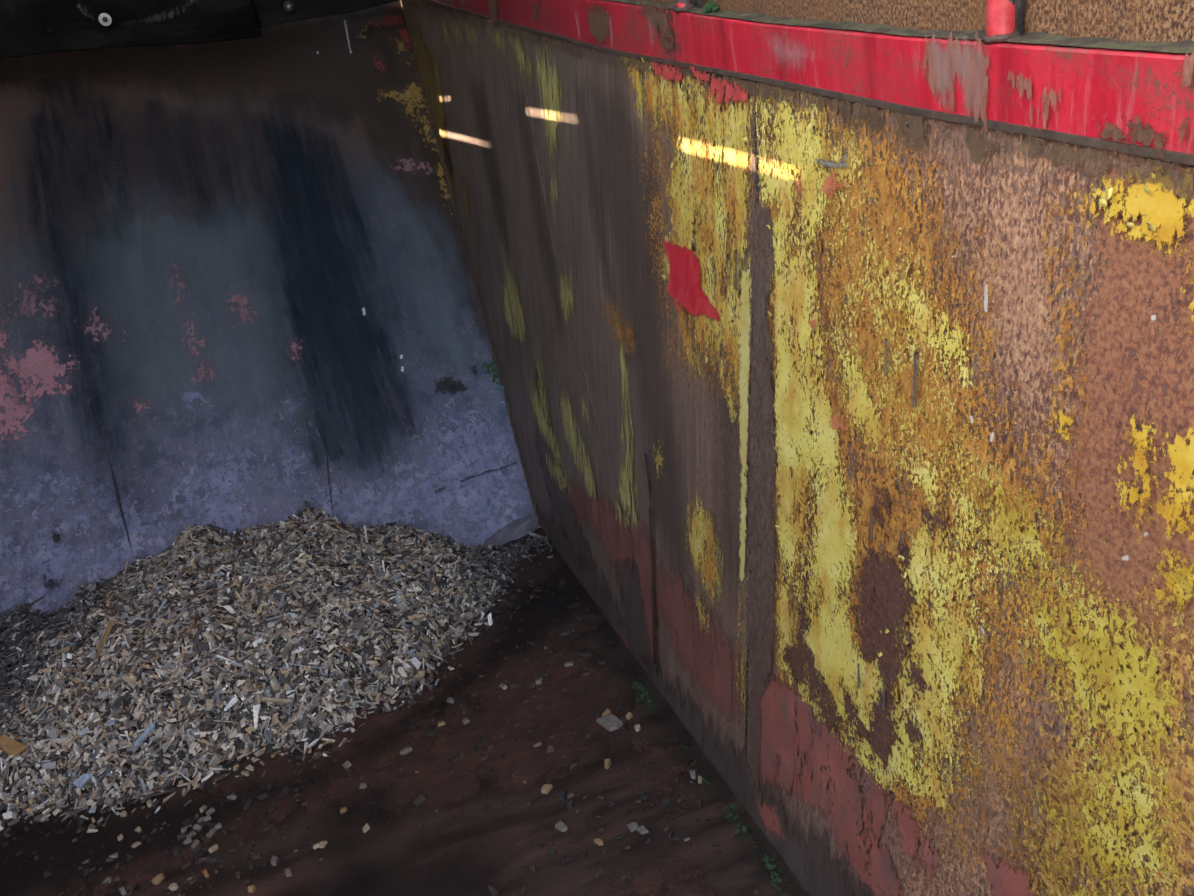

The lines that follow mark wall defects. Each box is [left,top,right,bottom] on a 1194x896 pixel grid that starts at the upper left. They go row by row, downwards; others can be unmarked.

corrosion [586,3,609,46]
corrosion [637,0,681,59]
peeling [373,81,452,215]
peeling [0,272,80,448]
peeling [74,307,128,346]
peeling [166,263,217,414]
leakage [32,116,393,464]
peeling [0,375,537,618]
corrosion [434,377,467,394]
peeling [621,51,1194,896]
corrosion [629,29,1194,896]
corrosion [198,620,628,843]